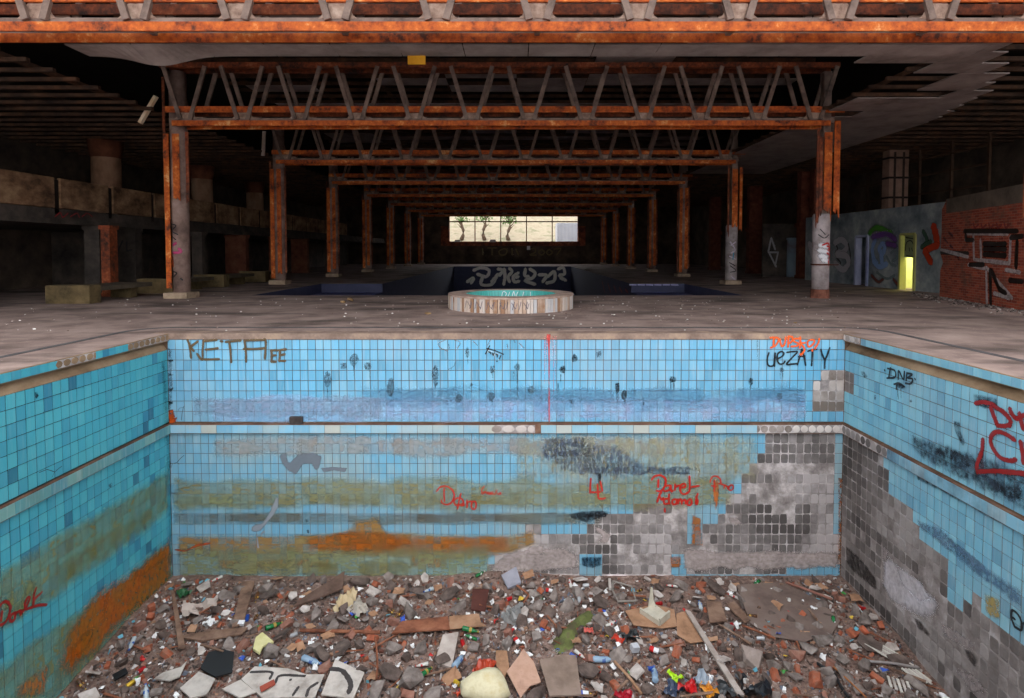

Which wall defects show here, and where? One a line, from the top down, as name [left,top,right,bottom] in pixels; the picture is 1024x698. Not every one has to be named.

water stain [0,603,143,698]
corrosion [64,520,534,669]
water stain [1,436,731,623]
spalling [487,425,1024,698]
water stain [913,422,1024,507]